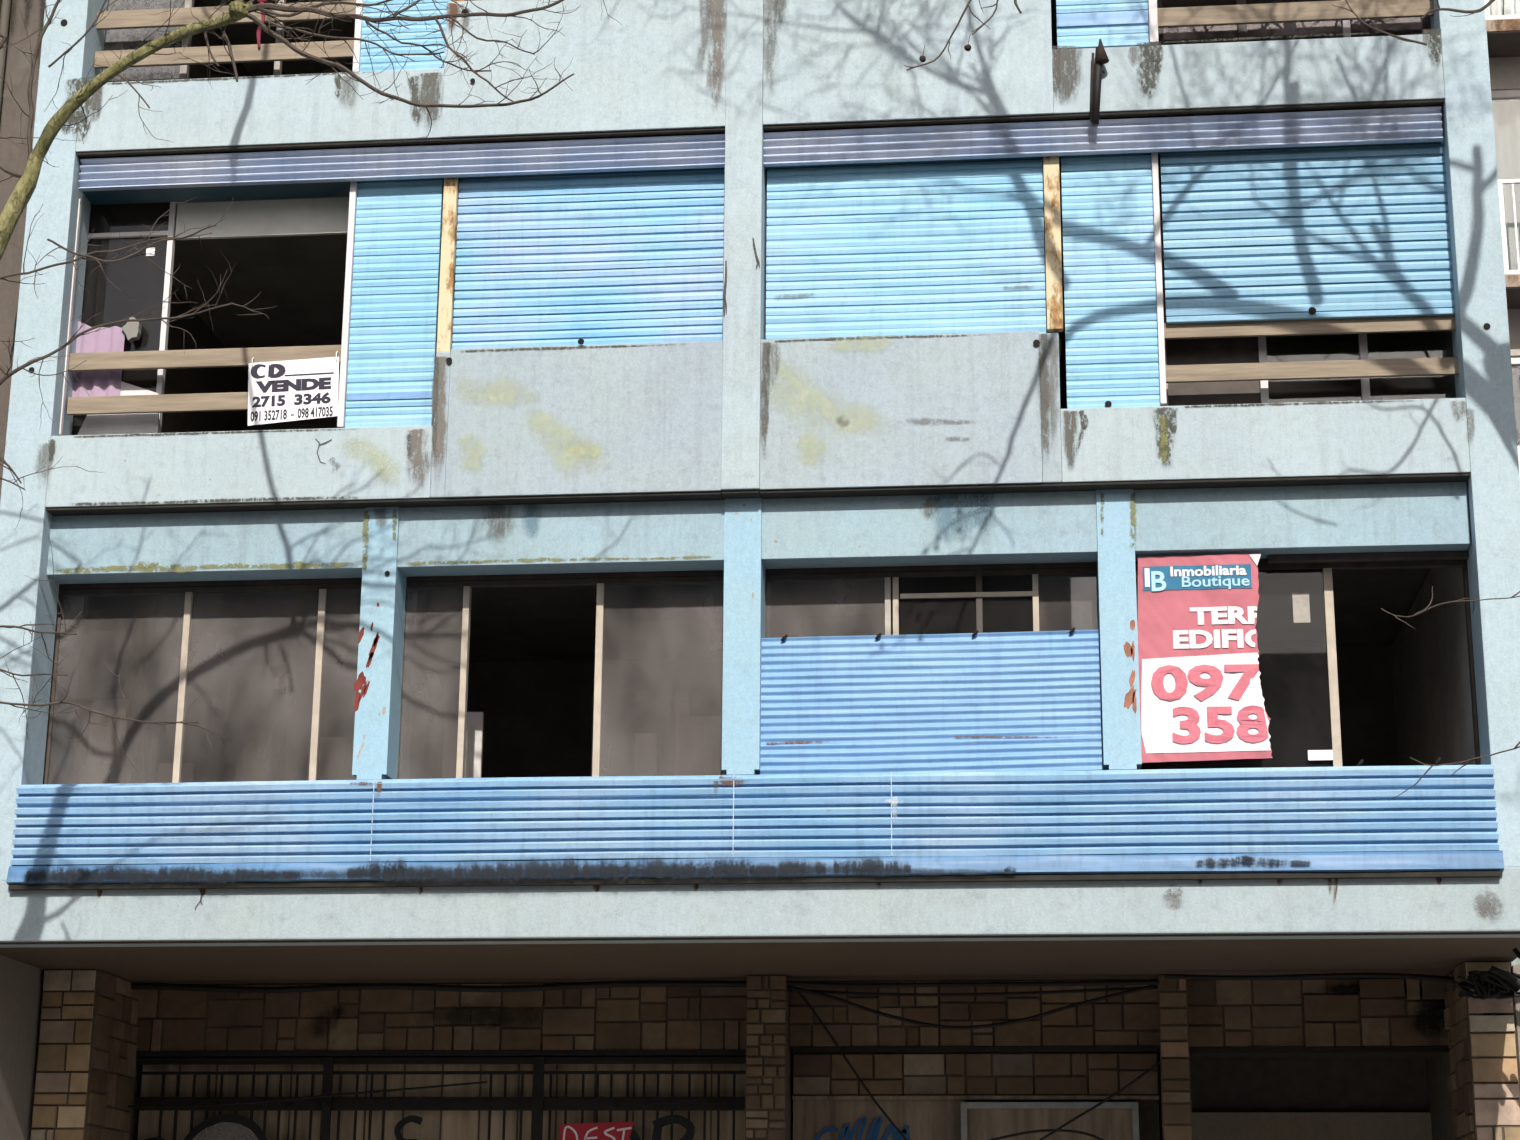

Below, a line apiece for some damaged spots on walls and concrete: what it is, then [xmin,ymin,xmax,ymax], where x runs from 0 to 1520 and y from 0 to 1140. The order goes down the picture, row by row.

leakage [62,77,102,137]
leakage [700,0,727,100]
leakage [766,0,784,71]
leakage [1052,46,1079,99]
leakage [1130,41,1163,94]
leakage [761,342,778,445]
leakage [1039,333,1088,466]
leakage [1155,407,1177,465]